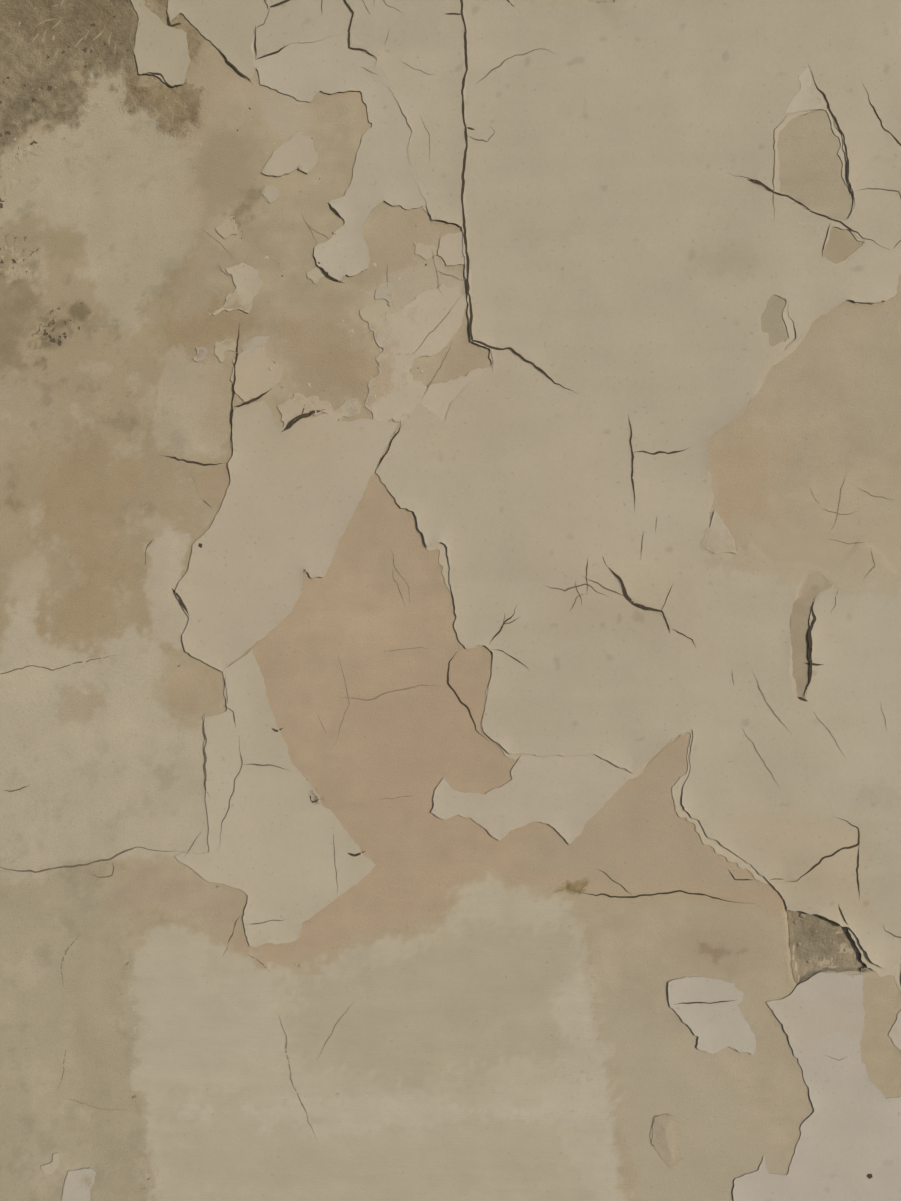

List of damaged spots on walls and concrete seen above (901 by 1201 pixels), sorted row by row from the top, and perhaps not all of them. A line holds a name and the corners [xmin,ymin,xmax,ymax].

water stain [0,122,61,389]
crack [219,0,290,82]
crack [301,205,343,283]
crack [321,0,578,398]
crack [733,64,901,257]
water stain [0,412,156,683]
peeling [0,0,783,964]
crack [547,416,695,645]
peeling [693,276,901,698]
crack [732,475,896,755]
peeling [41,1153,96,1201]
peeling [584,898,901,1201]